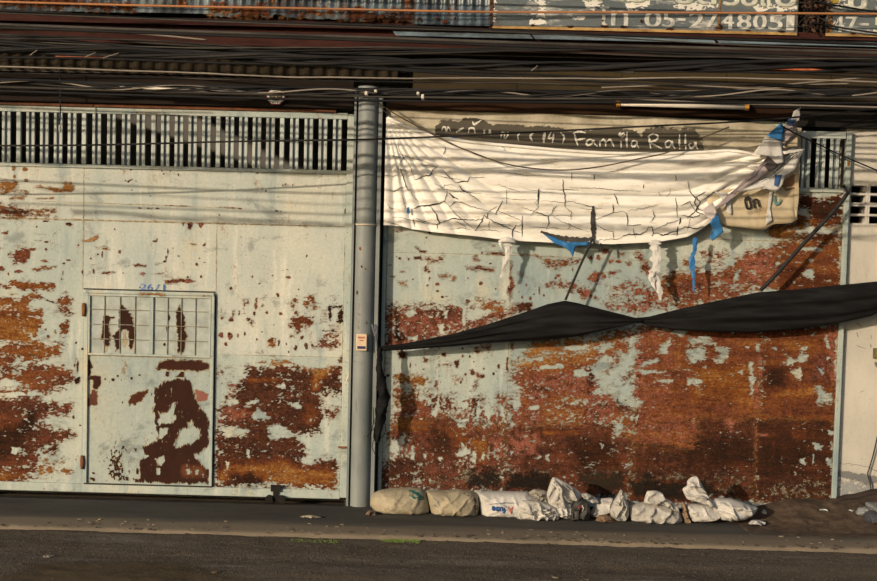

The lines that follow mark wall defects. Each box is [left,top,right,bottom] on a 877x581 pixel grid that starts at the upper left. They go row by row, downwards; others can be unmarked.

peeling [529,0,547,25]
peeling [570,0,604,20]
peeling [625,0,650,11]
peeling [673,1,719,11]
peeling [753,4,797,12]
rust [0,166,74,228]
rust [0,240,84,482]
rust [375,192,843,505]
rust [212,289,344,490]